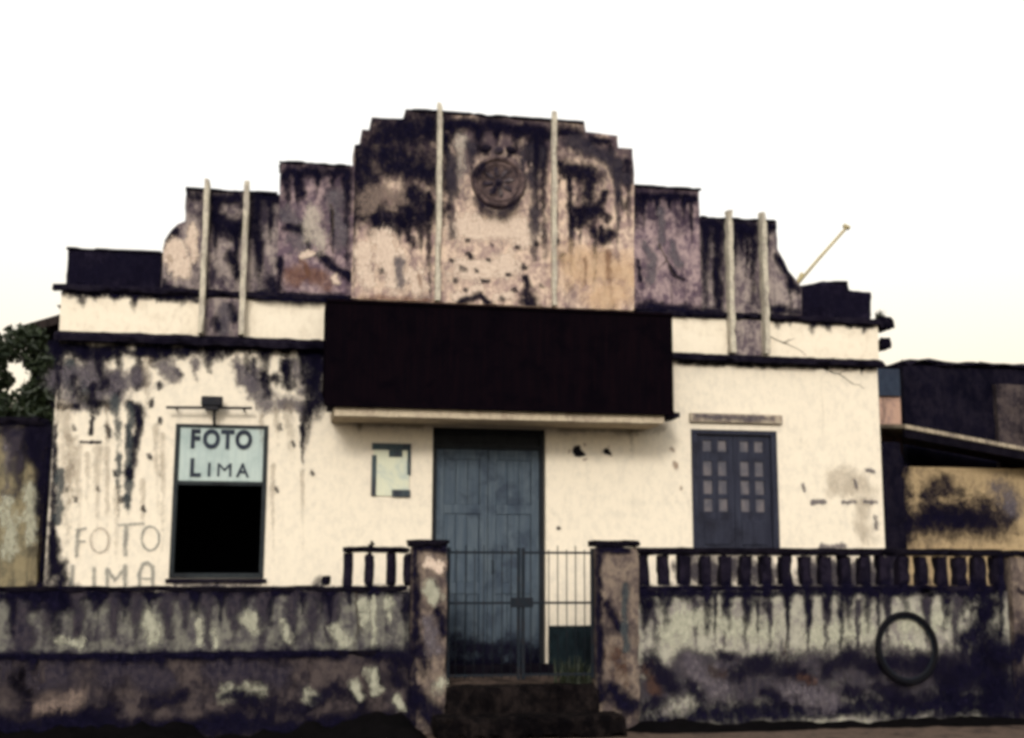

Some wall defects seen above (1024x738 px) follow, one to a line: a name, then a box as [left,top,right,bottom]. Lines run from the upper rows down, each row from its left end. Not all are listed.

water stain [186,110,875,332]
water stain [47,302,325,512]
water stain [0,422,539,738]
water stain [594,465,1024,725]